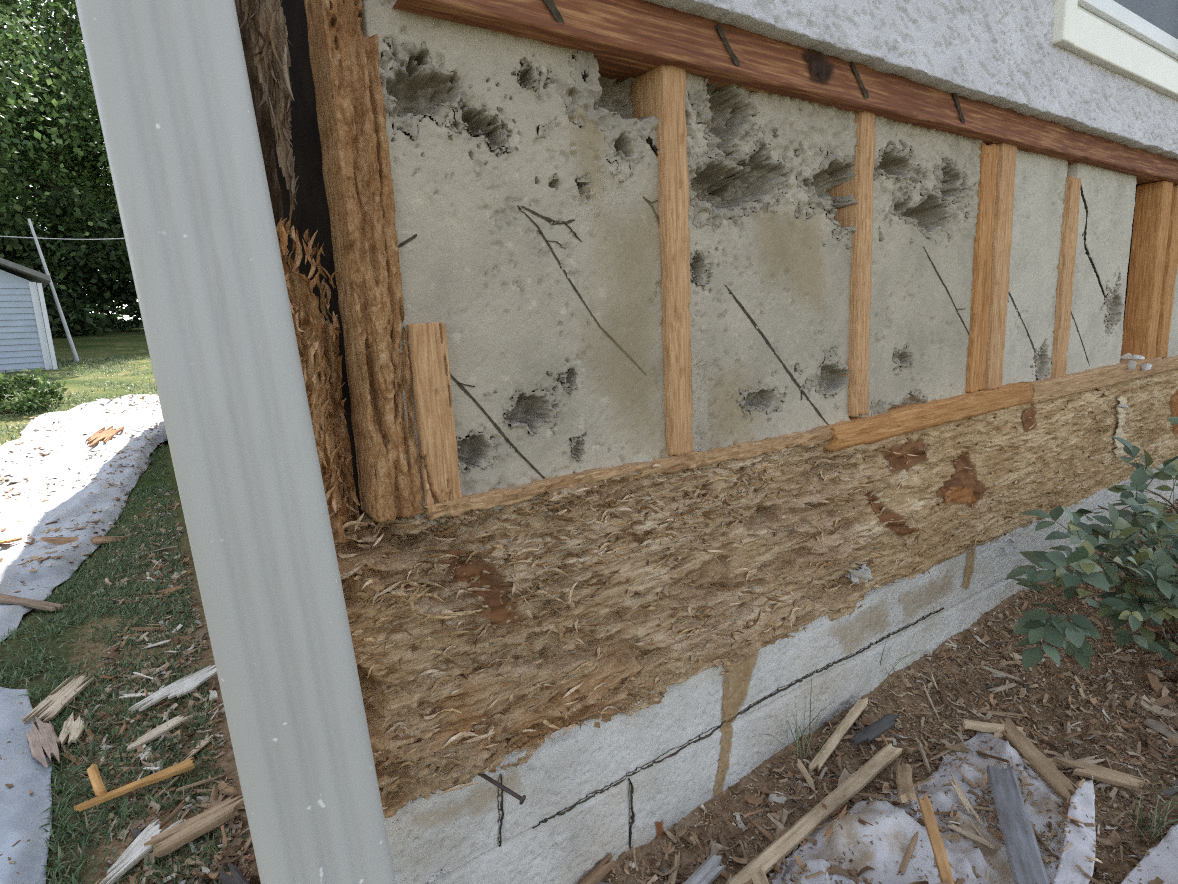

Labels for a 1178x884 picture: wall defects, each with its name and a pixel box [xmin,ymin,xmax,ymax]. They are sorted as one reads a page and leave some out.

spalling [370,38,518,157]
spalling [515,50,659,183]
spalling [685,77,858,248]
spalling [873,141,976,244]
spalling [690,250,713,290]
crack [1080,186,1106,300]
spalling [503,364,579,436]
spalling [732,346,850,421]
spalling [1031,339,1054,381]
spalling [456,427,512,473]
spalling [570,434,587,462]
damp [714,719,734,796]